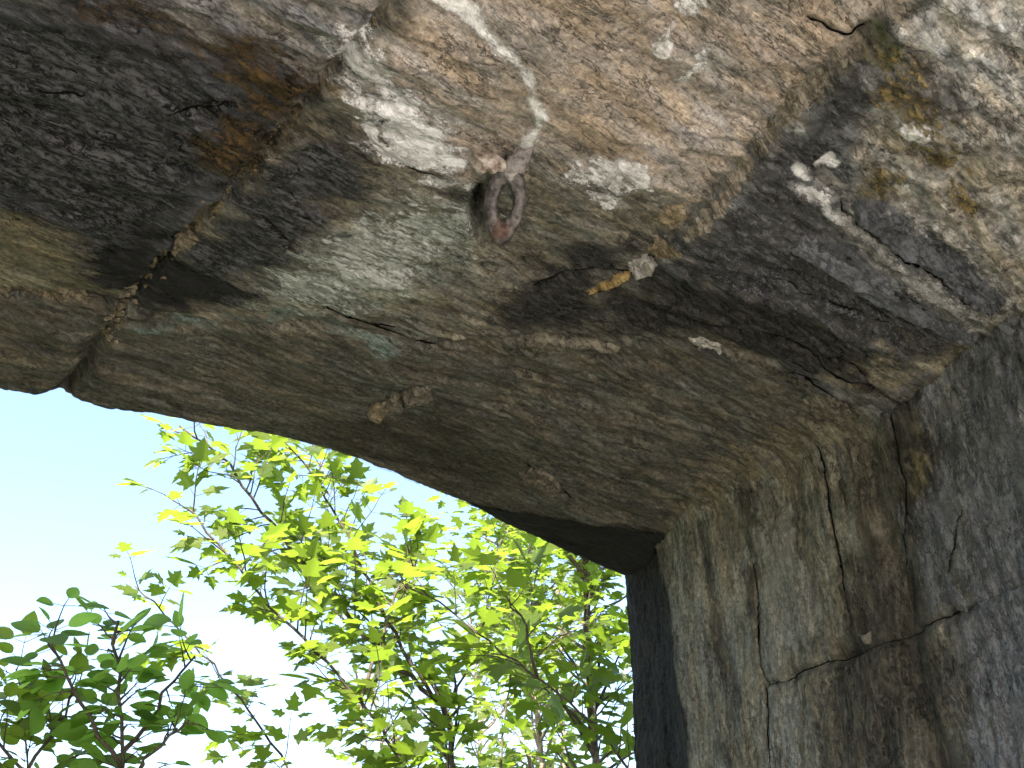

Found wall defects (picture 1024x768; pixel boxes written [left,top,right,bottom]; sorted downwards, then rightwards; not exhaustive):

rust [69,0,355,178]
damp [432,0,548,149]
crack [807,15,865,35]
crack [326,306,435,344]
damp [564,156,655,210]
crack [840,200,970,306]
crack [816,445,852,625]
crack [890,413,908,565]
crack [948,510,962,572]
crack [754,564,1022,766]